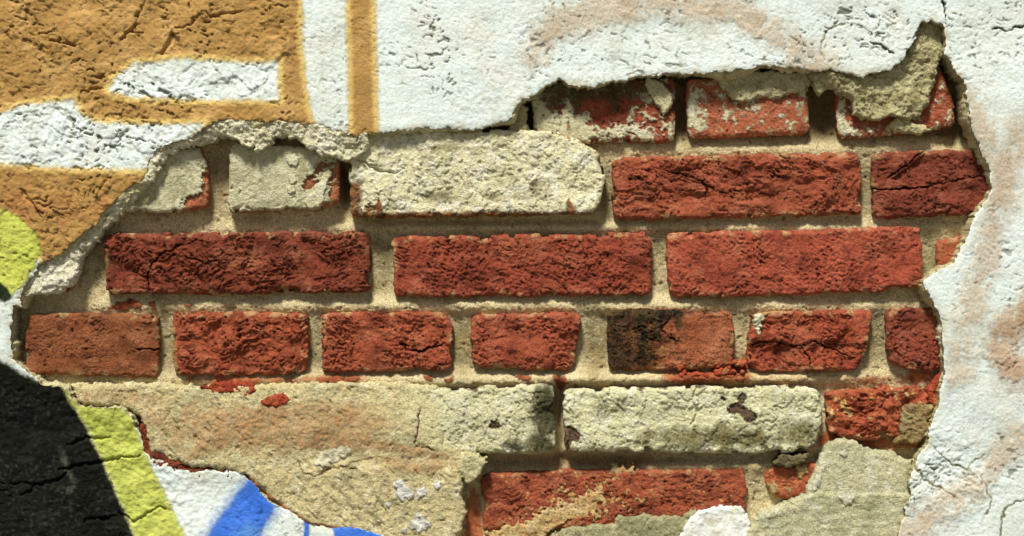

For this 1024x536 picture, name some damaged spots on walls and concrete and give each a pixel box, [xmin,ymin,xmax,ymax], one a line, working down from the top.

peeling [57,66,839,261]
peeling [836,95,908,139]
crack [872,151,978,191]
spalling [913,21,990,223]
spalling [917,237,965,383]
spalling [12,285,248,479]
peeling [423,375,853,485]
peeling [865,387,933,462]
peeling [401,513,431,533]
peeling [416,480,441,499]
crack [915,445,1024,536]